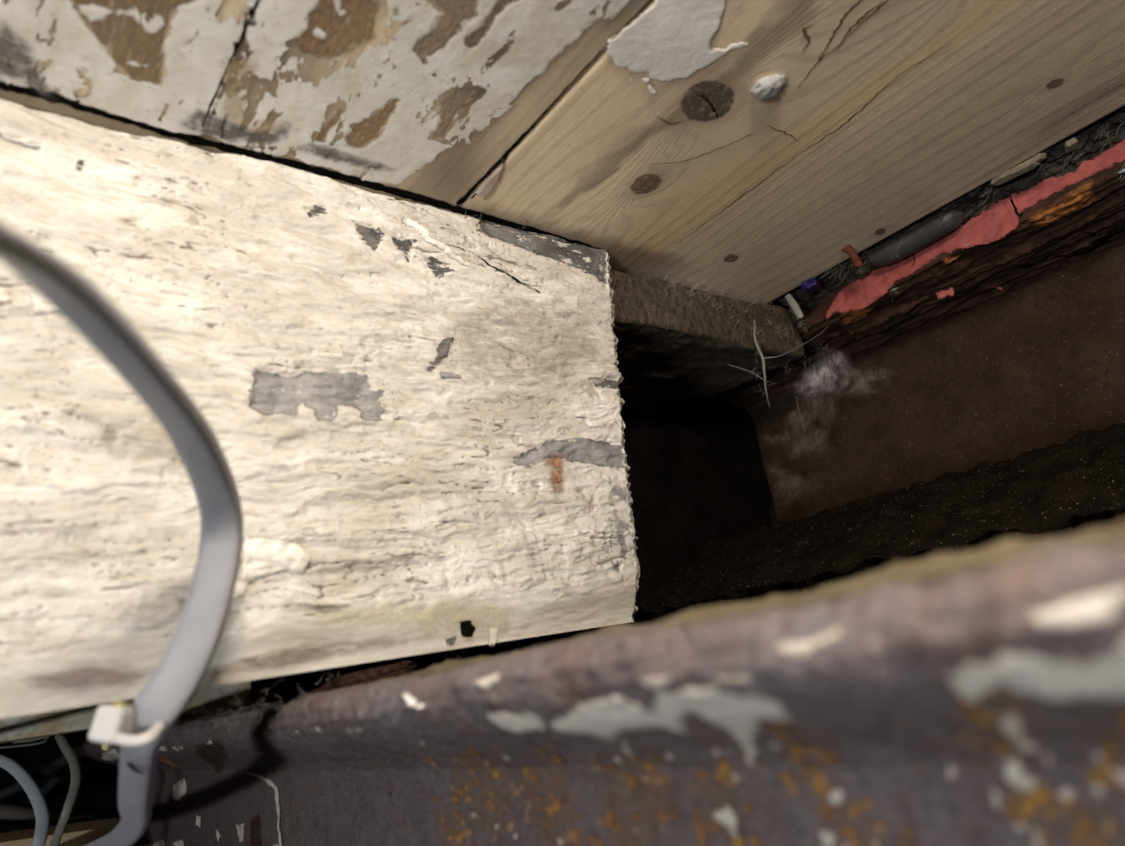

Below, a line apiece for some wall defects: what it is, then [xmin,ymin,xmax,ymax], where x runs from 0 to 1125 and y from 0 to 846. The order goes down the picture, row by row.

crack [798,0,888,88]
peeling [0,0,749,185]
crack [652,43,951,243]
peeling [306,205,327,217]
peeling [356,218,469,278]
peeling [476,219,610,290]
peeling [248,370,385,422]
corrosion [548,457,563,492]
peeling [513,438,627,468]
corrosion [422,744,762,846]
corrosion [764,723,841,798]
peeling [992,750,1037,807]